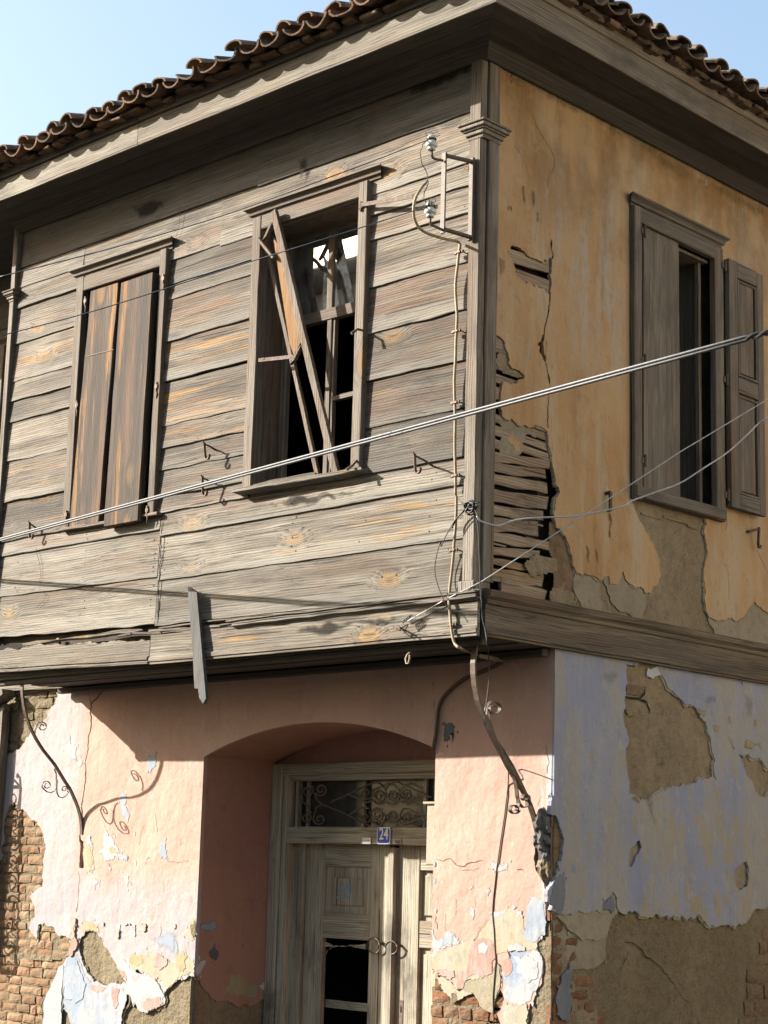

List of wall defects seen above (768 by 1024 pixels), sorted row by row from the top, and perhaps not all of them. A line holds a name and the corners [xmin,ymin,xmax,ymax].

crack [543,292,551,428]
flaking render [490,336,768,633]
flaking render [7,689,58,755]
peeling [119,793,135,835]
flaking render [623,663,716,802]
flaking render [739,754,768,797]
flaking render [0,803,264,1024]
flaking render [430,807,768,1024]
crack [619,941,693,1011]